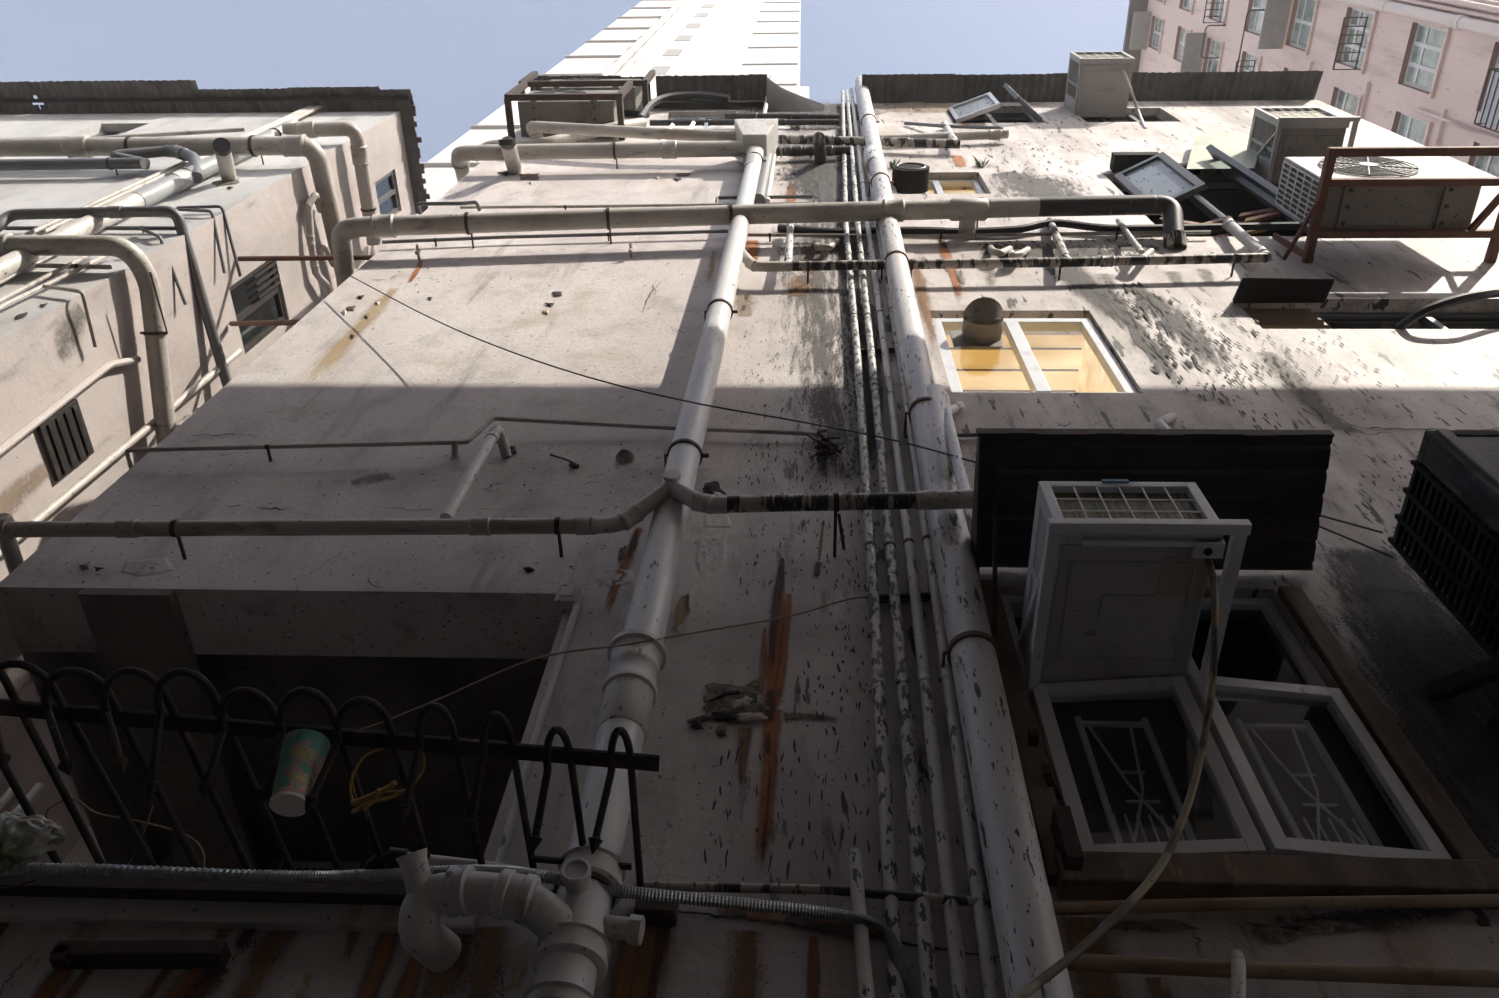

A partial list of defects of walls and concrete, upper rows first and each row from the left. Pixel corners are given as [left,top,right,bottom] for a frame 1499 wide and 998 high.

leakage [778,134,857,202]
leakage [1166,271,1182,284]
leakage [1093,273,1232,372]
leakage [841,291,884,463]
corrosion [738,558,792,859]
corrosion [141,967,230,998]
corrosion [344,931,470,998]
corrosion [608,907,672,998]
corrosion [728,930,760,998]
corrosion [807,936,820,998]